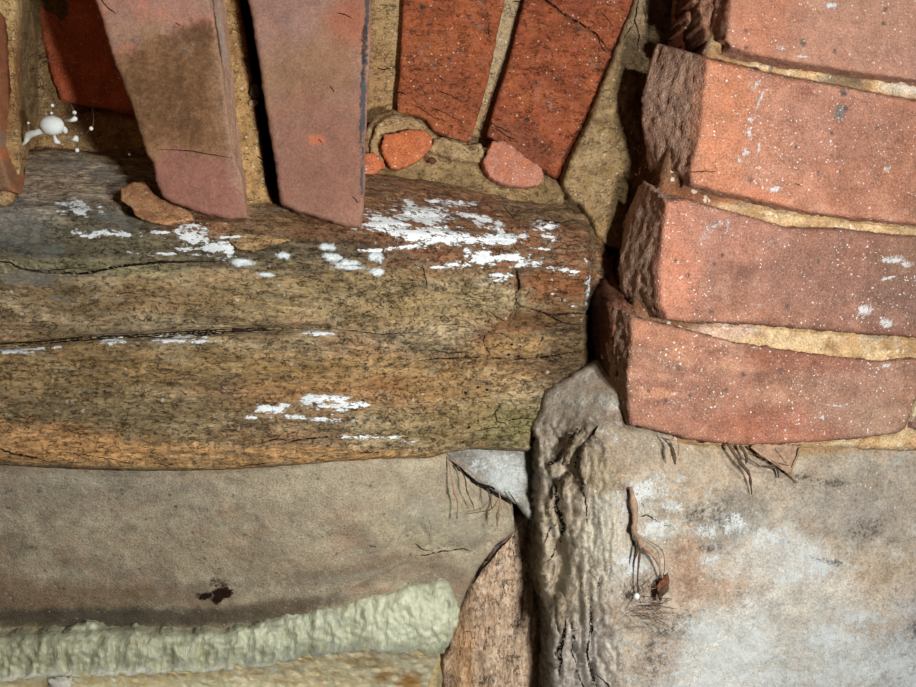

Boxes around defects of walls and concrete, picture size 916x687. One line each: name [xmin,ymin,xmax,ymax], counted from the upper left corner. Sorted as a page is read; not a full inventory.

leakage [54,197,106,218]
crack [0,258,261,275]
leakage [71,220,274,277]
leakage [319,198,591,307]
crack [420,270,589,361]
crack [0,327,416,347]
leakage [244,393,370,423]
leakage [341,435,416,443]